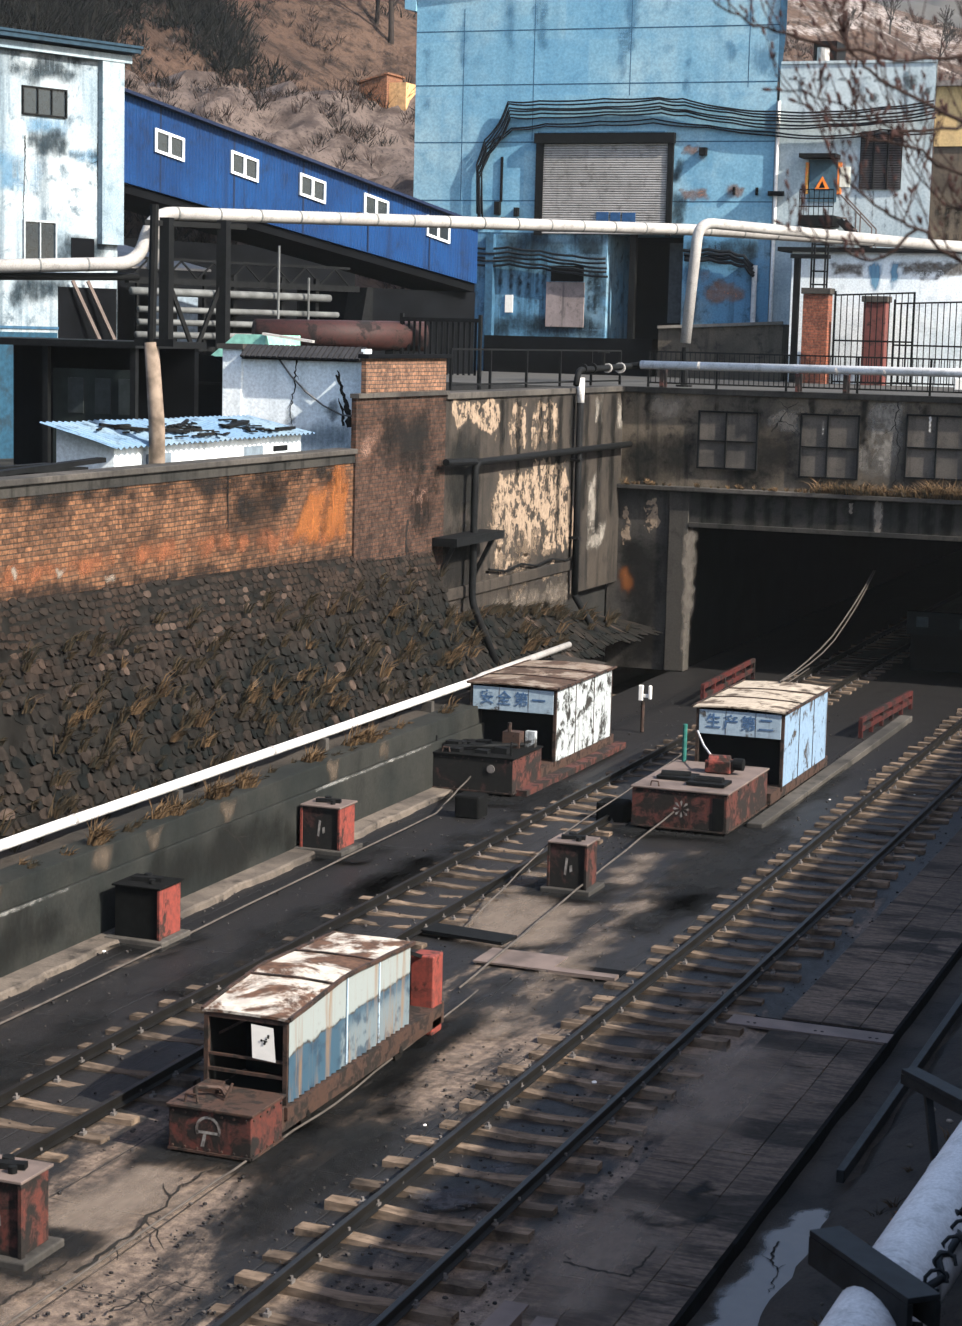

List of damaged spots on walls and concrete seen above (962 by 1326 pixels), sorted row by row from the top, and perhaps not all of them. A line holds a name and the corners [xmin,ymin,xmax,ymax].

peeling [706,282,743,303]
corrosion [297,466,347,542]
flaking render [452,398,606,600]
spalling [621,497,661,545]